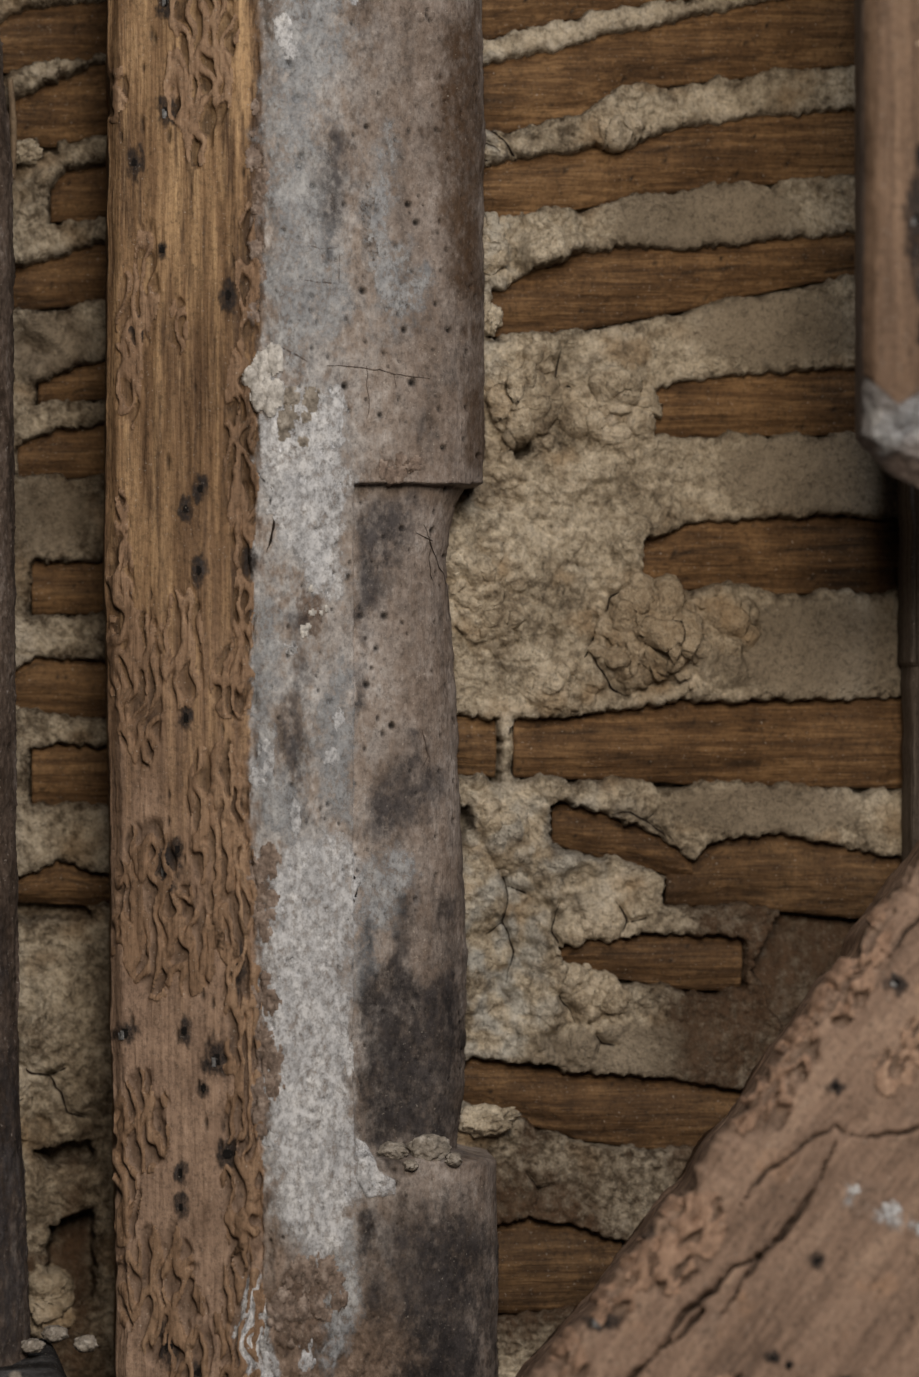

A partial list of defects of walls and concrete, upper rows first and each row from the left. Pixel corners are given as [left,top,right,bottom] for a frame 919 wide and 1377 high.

water stain [244,547,256,576]
water stain [359,503,410,610]
water stain [279,700,307,792]
water stain [371,766,443,834]
crack [551,903,560,944]
crack [616,902,648,932]
crack [880,920,919,956]
water stain [353,932,466,1163]
crack [559,995,614,1053]
water stain [367,1171,623,1377]
crack [636,1125,919,1376]